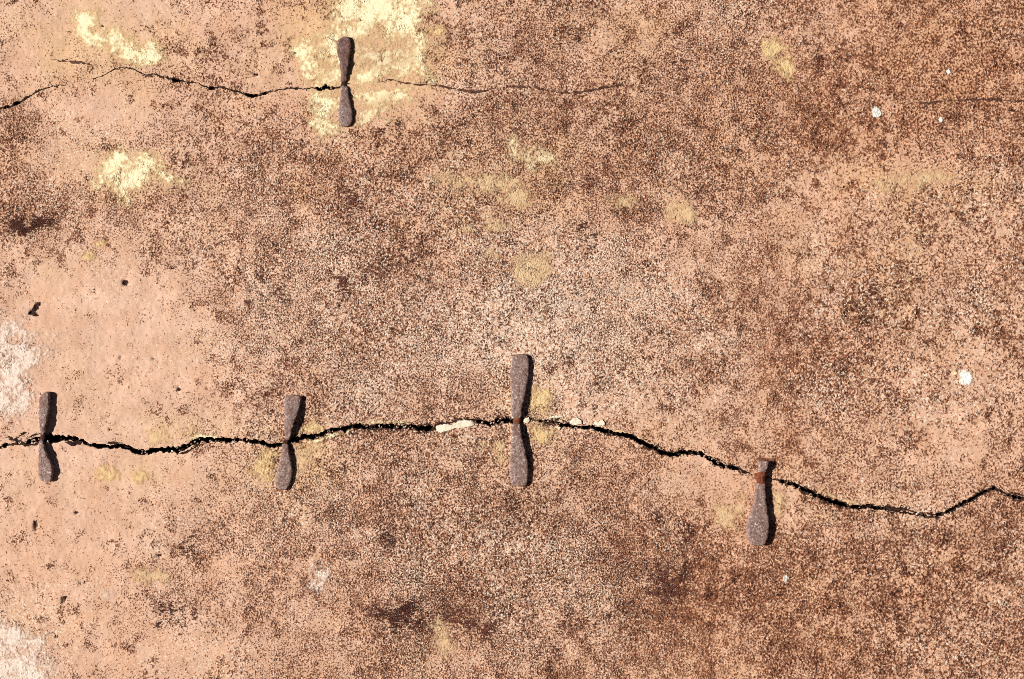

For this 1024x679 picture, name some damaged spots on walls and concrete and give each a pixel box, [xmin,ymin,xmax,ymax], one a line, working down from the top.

crack [0,57,349,109]
crack [376,79,626,94]
crack [0,415,1024,520]